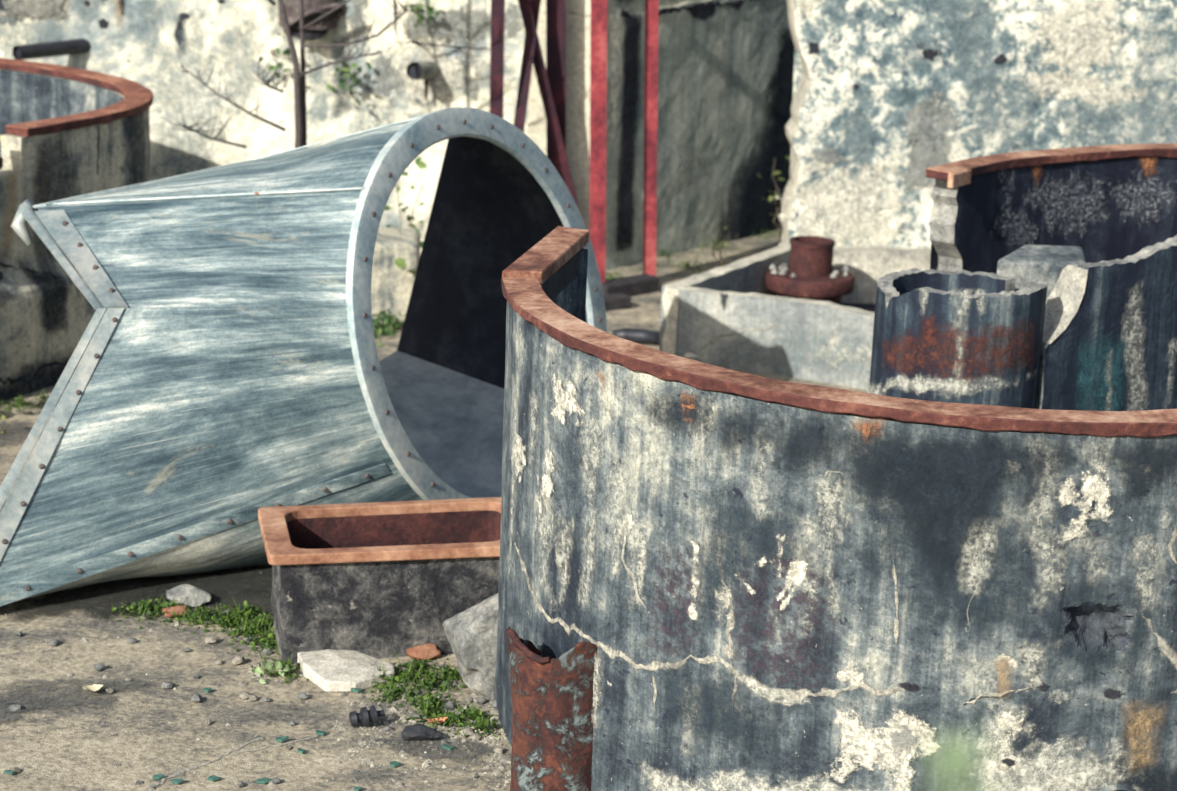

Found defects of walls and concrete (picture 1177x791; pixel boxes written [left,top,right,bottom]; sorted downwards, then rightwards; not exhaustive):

rust [885,318,1035,380]
damp [538,512,569,584]
crack [621,513,646,608]
crack [515,529,904,709]
damp [610,468,844,685]
damp [646,399,1075,632]
flaking render [1058,466,1113,542]
spalling [1021,568,1169,704]
crack [1142,616,1177,693]
flaking render [646,705,935,791]
flaking render [974,711,1122,791]
rust [1131,712,1154,762]